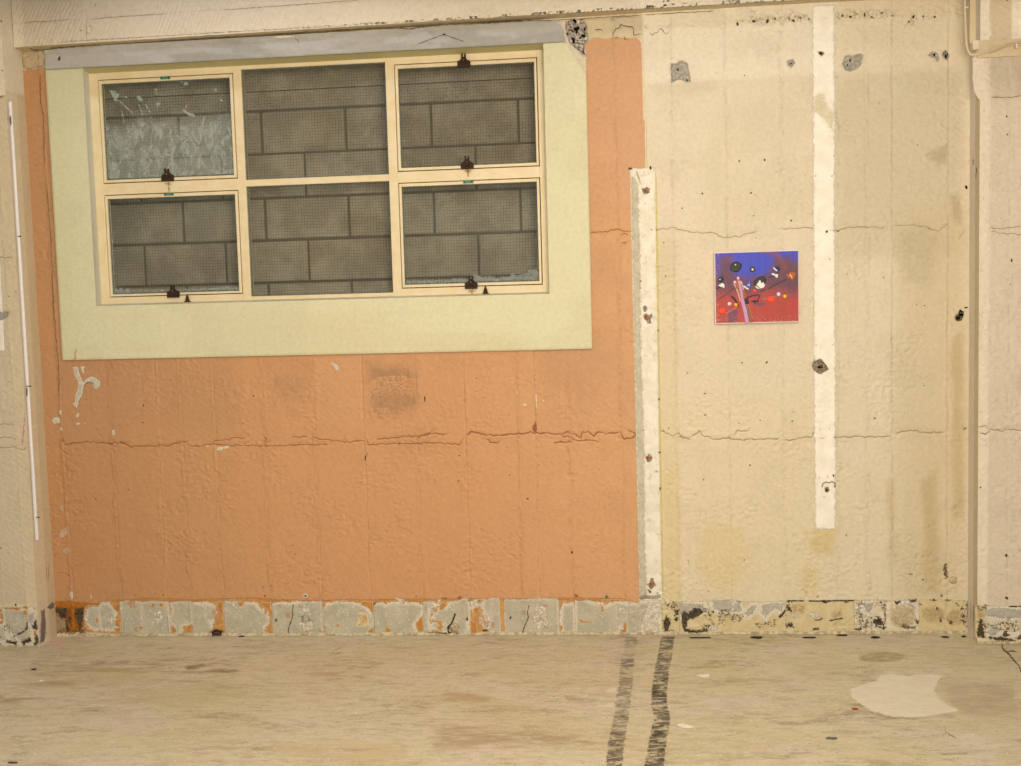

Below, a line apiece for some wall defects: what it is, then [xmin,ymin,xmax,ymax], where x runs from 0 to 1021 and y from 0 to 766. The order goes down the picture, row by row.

spalling [557,11,588,57]
spalling [670,60,691,83]
peeling [789,5,863,529]
peeling [73,366,100,425]
crack [62,429,636,455]
crack [660,430,943,441]
crack [980,425,1021,435]
peeling [0,604,38,646]
peeling [82,587,663,634]
peeling [728,595,855,632]
peeling [882,594,967,631]
peeling [985,596,1021,642]